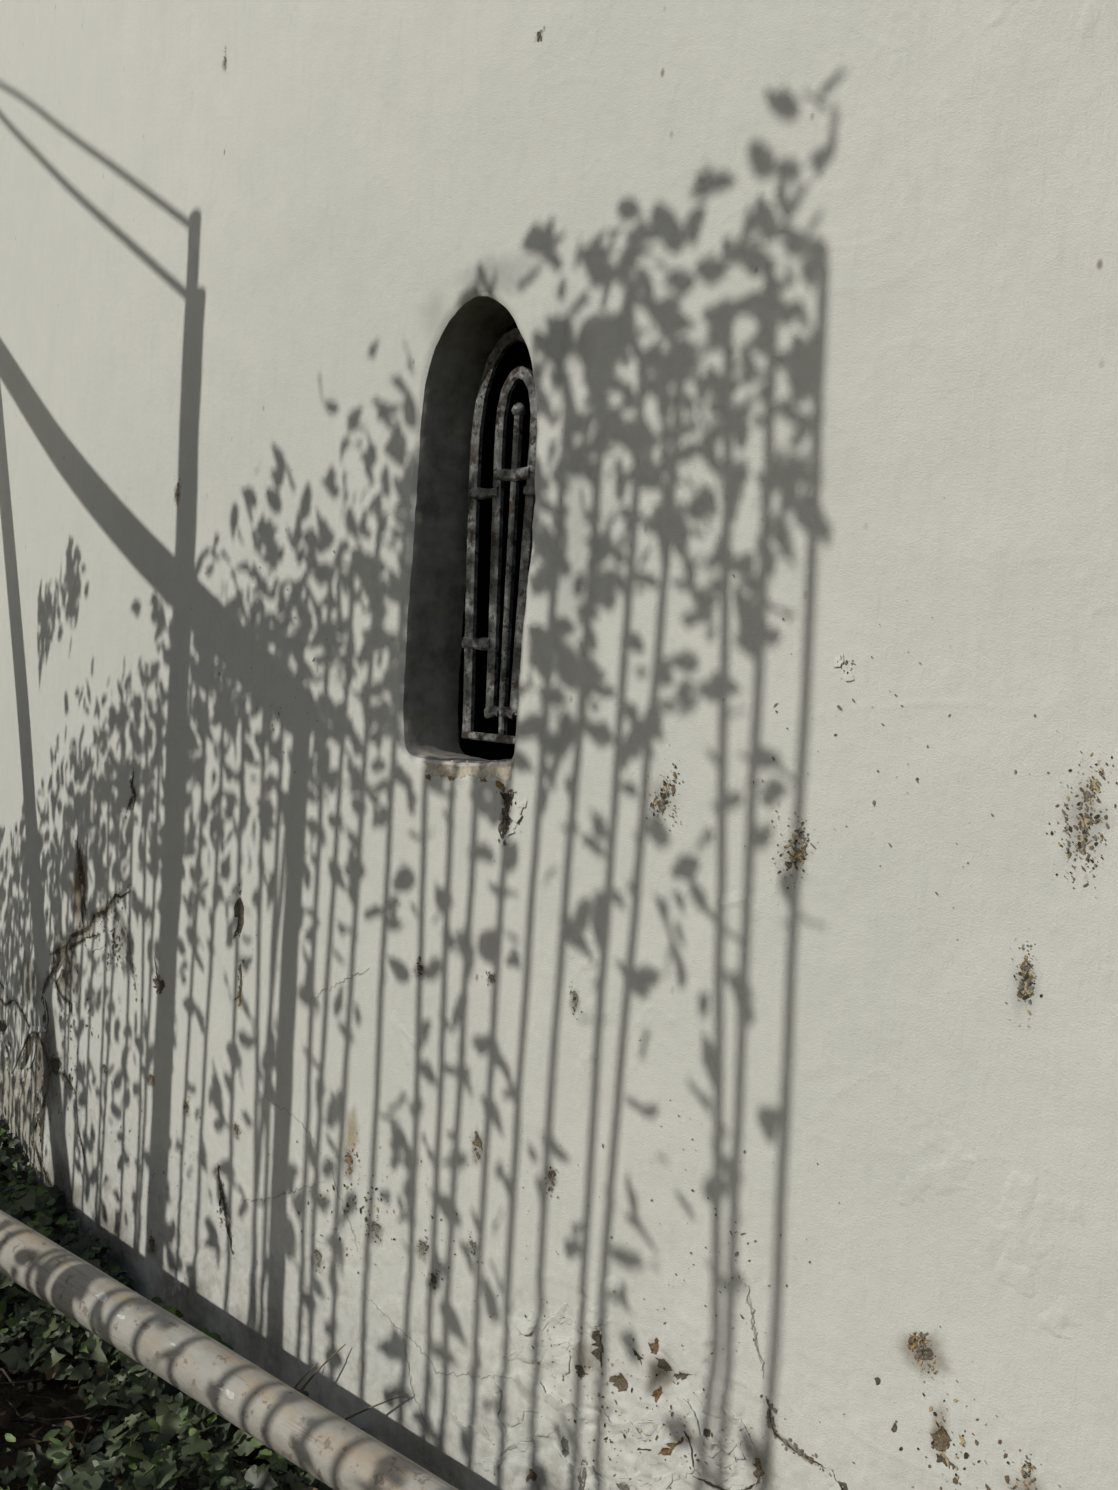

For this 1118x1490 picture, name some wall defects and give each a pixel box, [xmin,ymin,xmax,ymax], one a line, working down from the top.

peeling [422,759,527,862]
flaking render [0,991,62,1187]
crack [0,835,142,1219]
peeling [450,1299,848,1490]
crack [746,1285,764,1373]
flaking render [930,1412,957,1475]